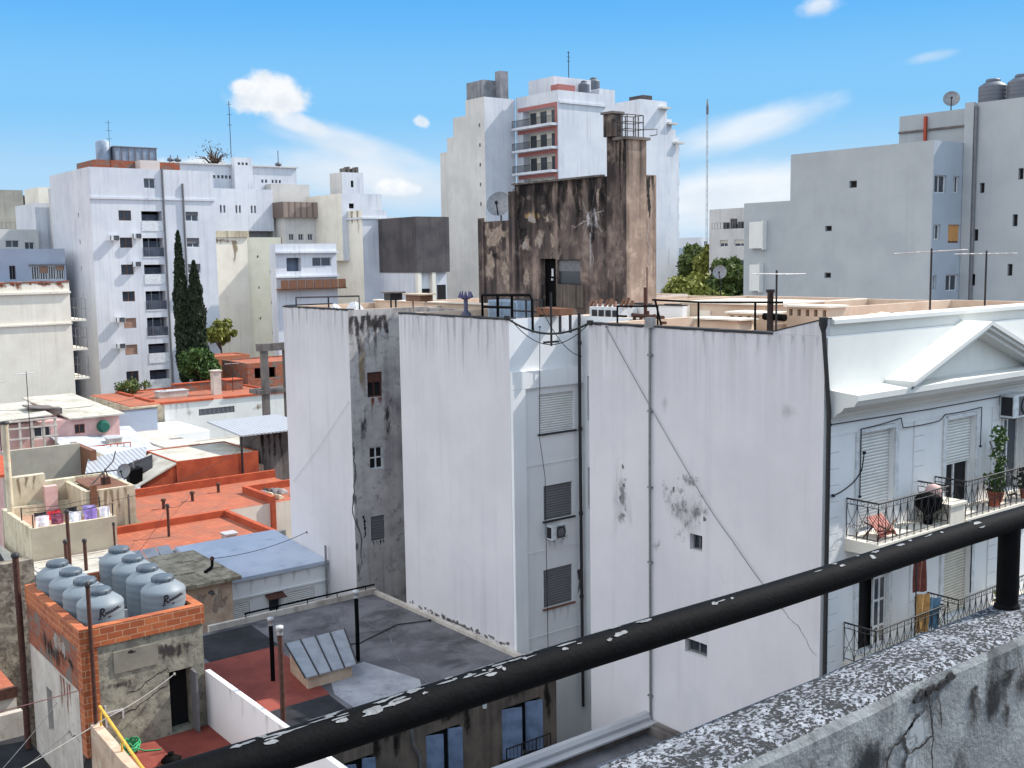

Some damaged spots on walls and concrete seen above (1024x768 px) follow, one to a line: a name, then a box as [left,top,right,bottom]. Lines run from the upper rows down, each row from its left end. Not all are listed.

flaking render [484,222,510,294]
flaking render [519,212,556,250]
water stain [518,177,607,266]
water stain [349,314,389,384]
water stain [158,643,189,659]
peeling [362,600,539,717]
peeling [607,618,652,641]
peeling [231,709,349,748]
crack [886,685,942,768]
water stain [970,668,1024,722]